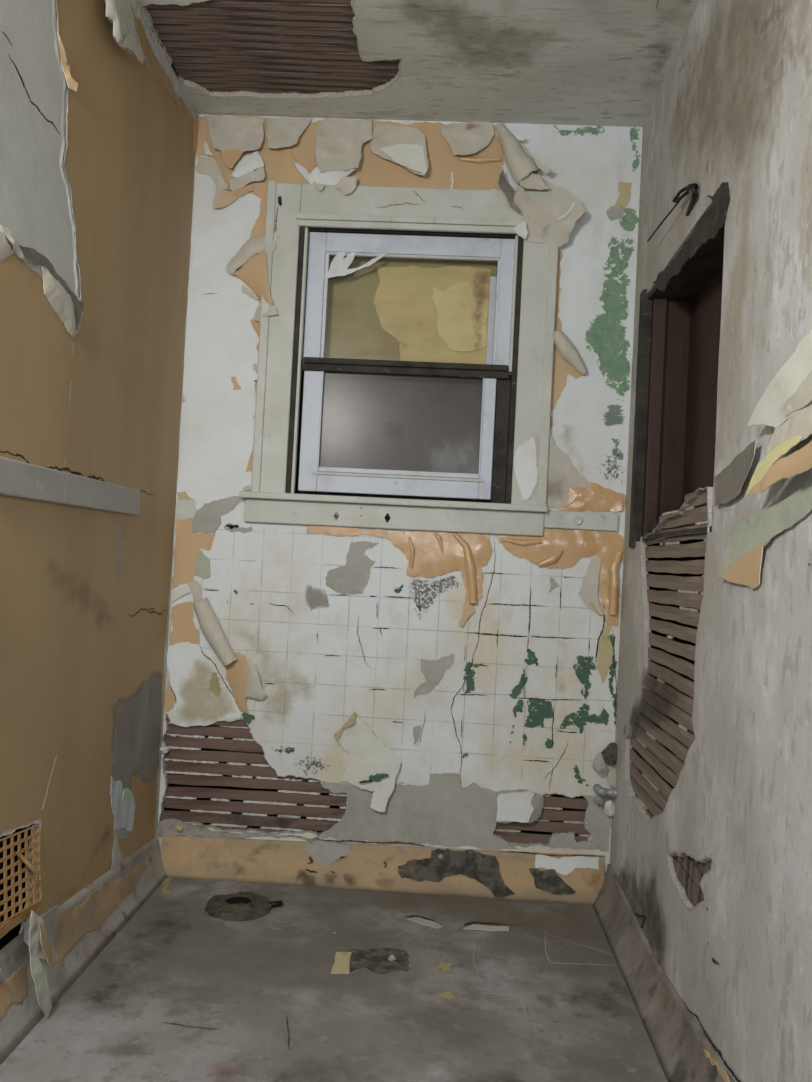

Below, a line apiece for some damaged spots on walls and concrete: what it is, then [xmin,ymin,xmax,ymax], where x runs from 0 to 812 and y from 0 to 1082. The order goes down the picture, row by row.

crack [2,32,60,134]
flaking render [606,181,639,231]
crack [0,451,105,482]
peeling [0,0,630,1020]
flaking render [625,329,812,825]
crack [341,594,410,690]
crack [451,542,617,790]
flaking render [666,850,713,911]
peeling [703,1049,730,1082]